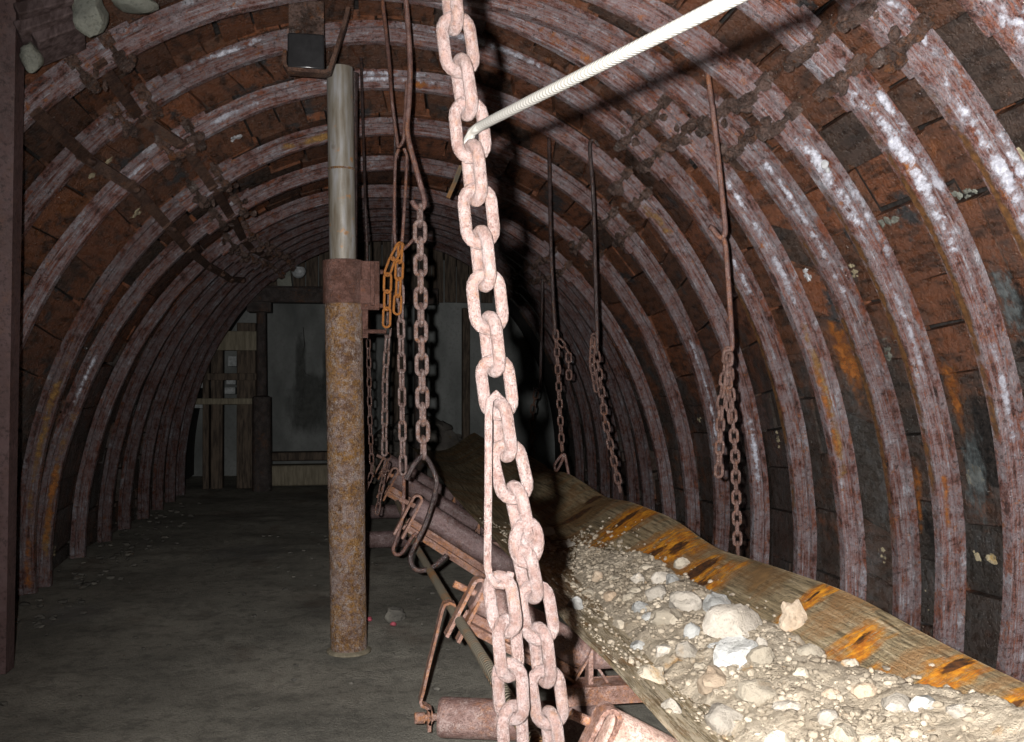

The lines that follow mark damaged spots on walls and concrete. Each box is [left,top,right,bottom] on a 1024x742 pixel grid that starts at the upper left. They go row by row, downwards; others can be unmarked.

damp [999,7,1024,43]
damp [798,146,871,227]
damp [851,91,957,251]
damp [958,106,1024,203]
rust [806,338,842,459]
rust [829,198,950,542]
damp [999,375,1010,414]